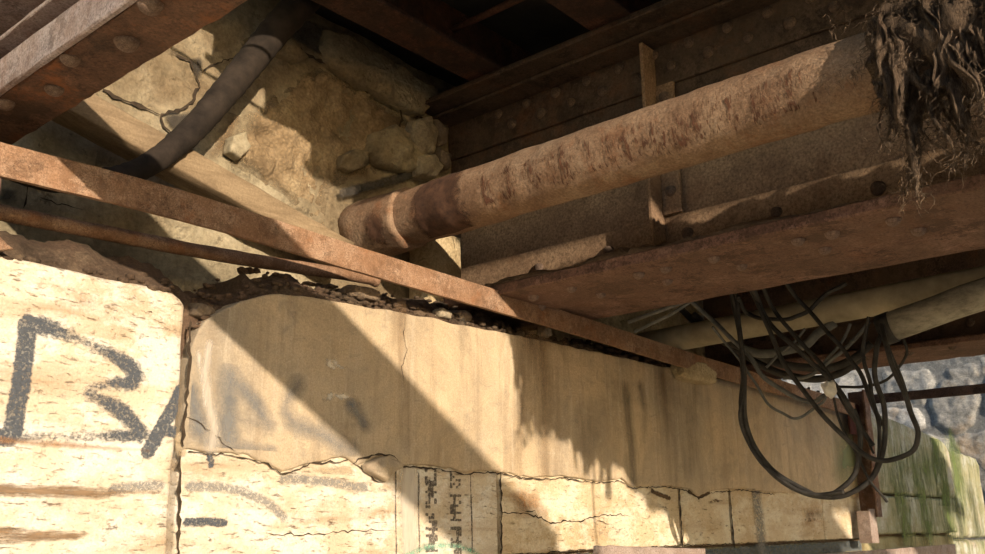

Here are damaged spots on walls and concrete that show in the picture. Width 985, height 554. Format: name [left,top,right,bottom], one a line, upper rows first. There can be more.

crack [103,52,233,132]
crack [269,528,381,536]
spalling [322,453,404,482]
crack [403,466,859,554]
water stain [895,438,978,547]